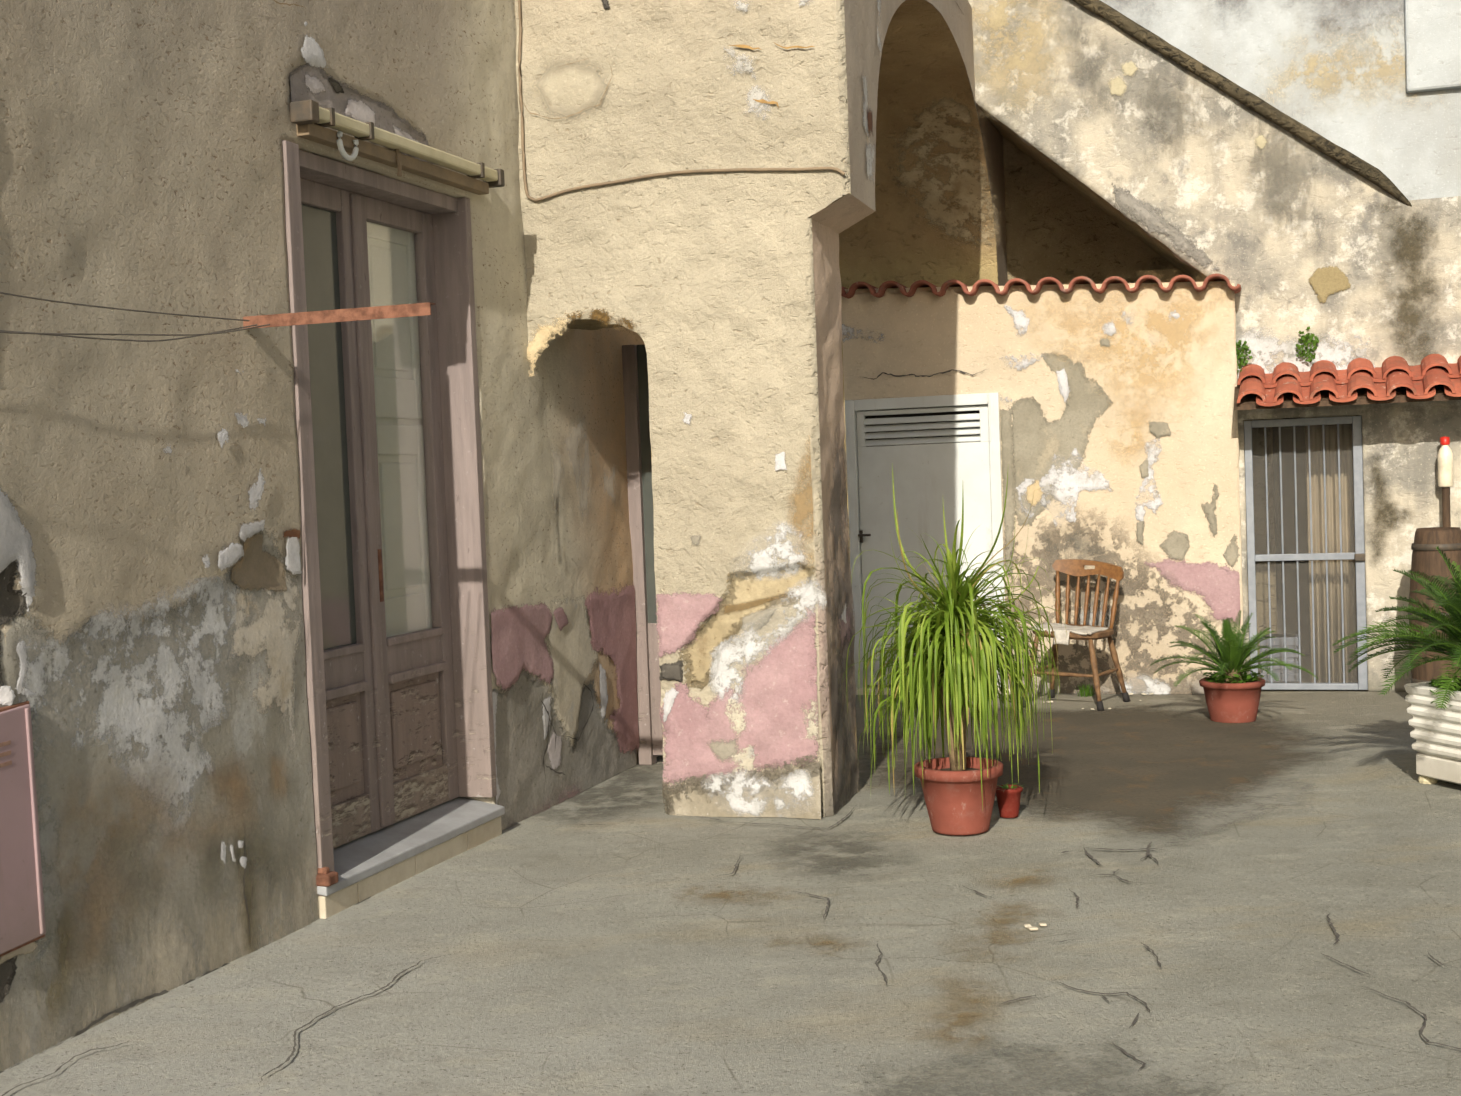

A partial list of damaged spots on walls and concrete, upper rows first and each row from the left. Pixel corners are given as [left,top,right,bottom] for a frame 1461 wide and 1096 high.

damp [1254,129,1305,216]
crack [864,369,984,380]
spalling [1000,352,1114,573]
damp [1386,206,1435,361]
spalling [0,468,319,1071]
spalling [491,581,639,830]
peeling [655,449,826,820]
damp [827,440,1315,833]
crack [0,824,251,1096]
damp [207,836,270,949]
crack [258,952,460,1088]
crack [1321,910,1461,1049]